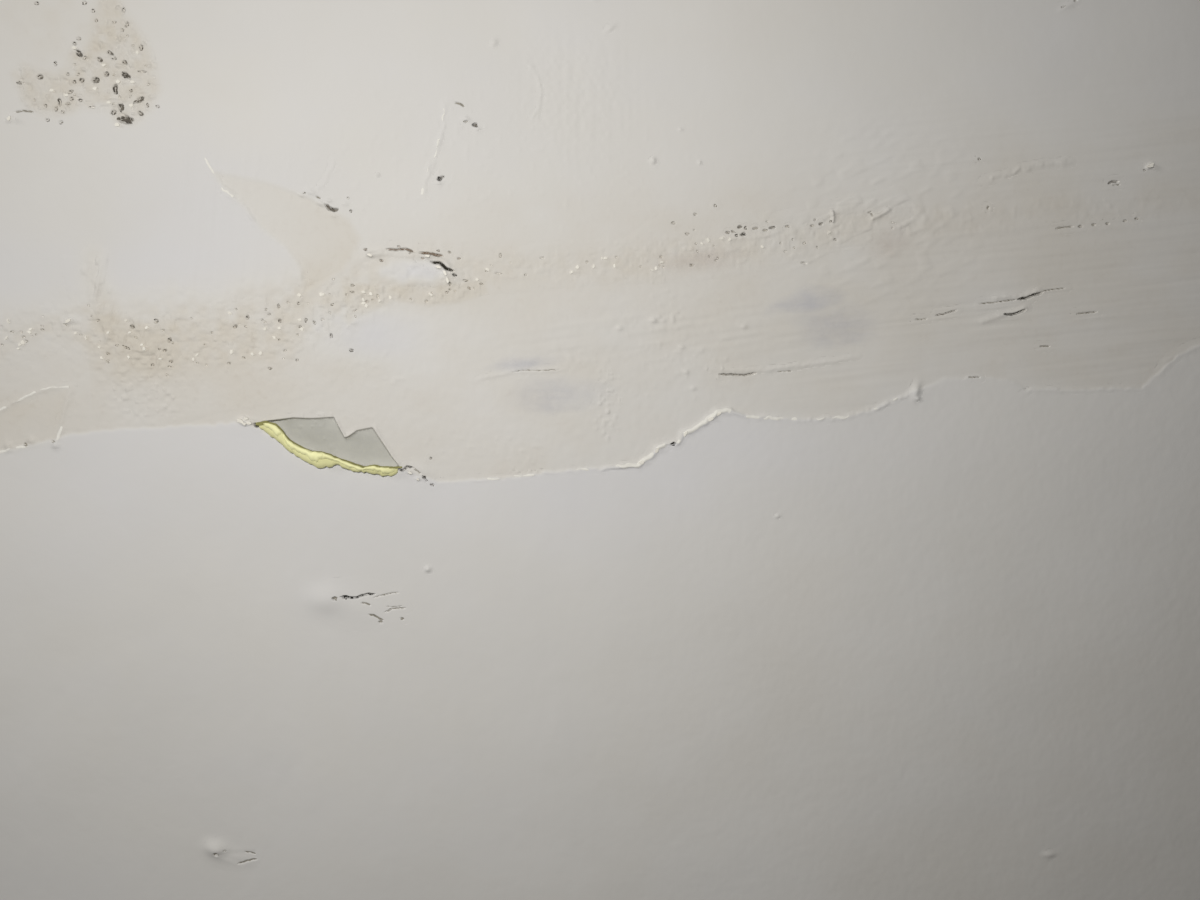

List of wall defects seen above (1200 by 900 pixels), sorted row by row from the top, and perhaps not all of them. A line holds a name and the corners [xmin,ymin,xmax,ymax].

spalling [3,0,166,131]
crack [930,281,1104,323]
peeling [236,411,439,492]